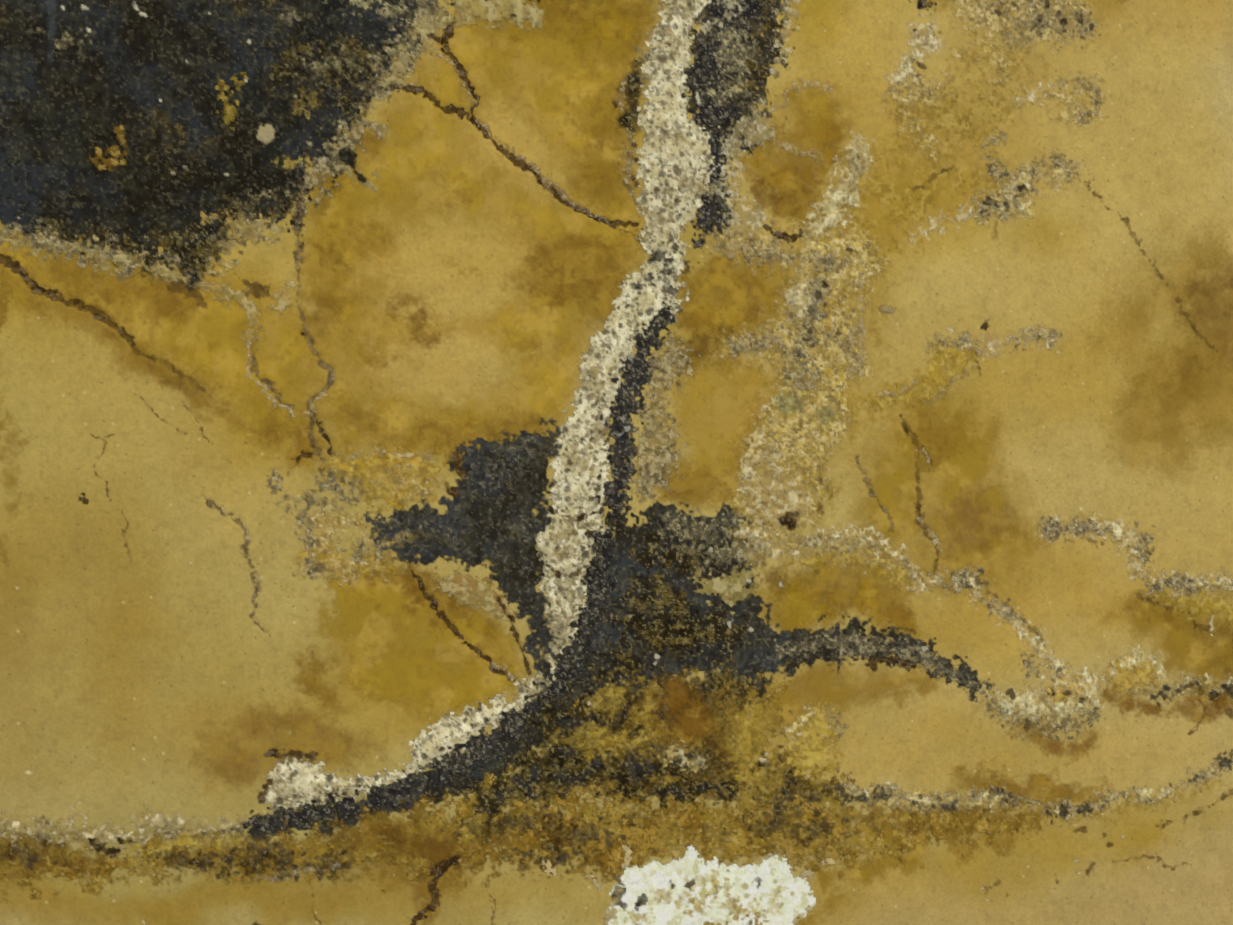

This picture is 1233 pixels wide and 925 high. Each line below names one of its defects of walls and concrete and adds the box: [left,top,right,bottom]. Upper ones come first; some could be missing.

crack [392,17,640,241]
leakage [886,0,1105,225]
leakage [0,263,47,325]
crack [0,254,209,442]
crack [245,181,334,463]
crack [856,414,939,556]
crack [411,570,531,697]
leakage [1038,511,1233,721]
leakage [765,666,861,778]
crack [411,855,460,925]
spalling [603,845,816,925]
leakage [834,749,1233,882]